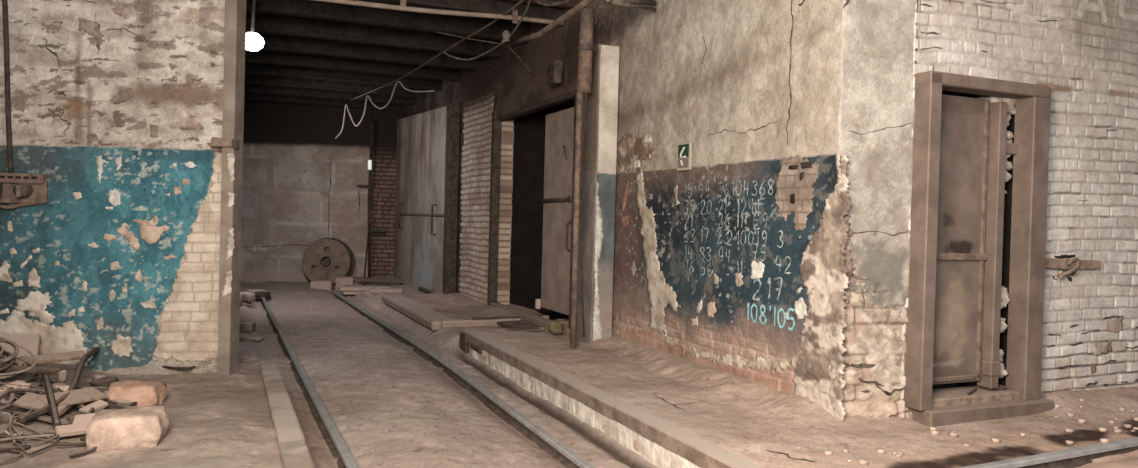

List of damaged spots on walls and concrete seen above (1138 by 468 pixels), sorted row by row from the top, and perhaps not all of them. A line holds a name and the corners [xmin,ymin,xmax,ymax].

spalling [78,18,103,55]
crack [707,0,805,150]
peeling [95,154,123,210]
peeling [0,247,93,367]
peeling [109,269,142,302]
peeling [87,216,170,250]
flaking render [141,143,235,363]
spalling [592,133,907,421]
peeling [110,334,133,357]